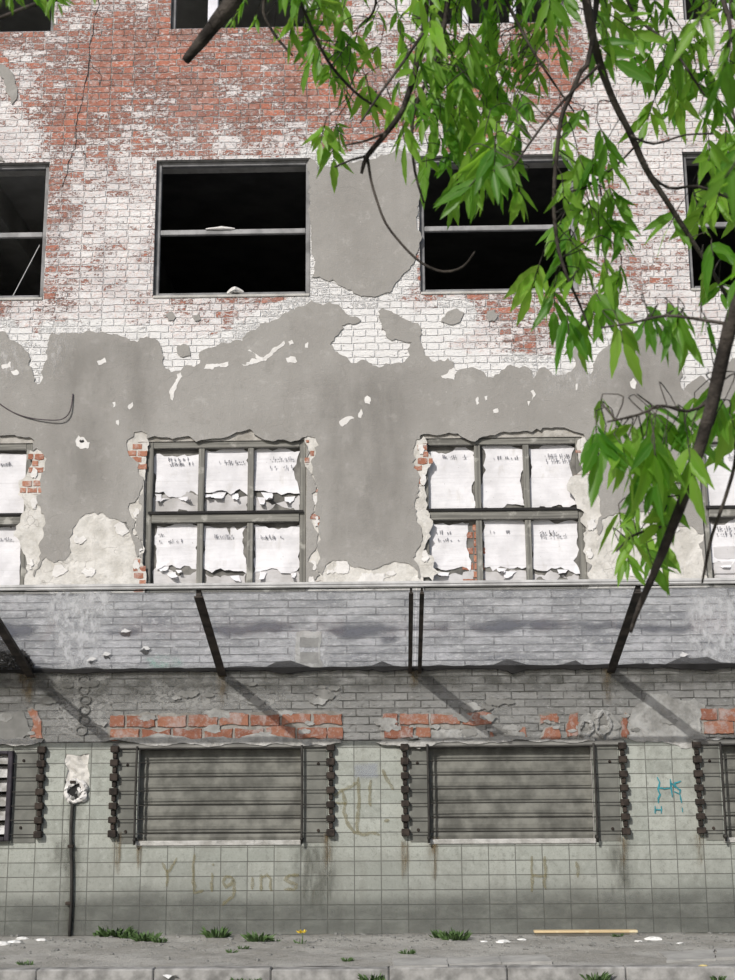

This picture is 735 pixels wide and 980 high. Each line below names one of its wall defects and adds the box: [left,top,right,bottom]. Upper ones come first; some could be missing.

crack [62,0,102,187]
peeling [307,149,422,297]
peeling [176,344,191,357]
flaking render [242,340,308,366]
peeling [441,308,464,325]
flaking render [14,431,149,593]
flaking render [304,436,440,591]
flaking render [0,652,344,741]
flaking render [374,697,527,741]
peeling [538,693,735,749]